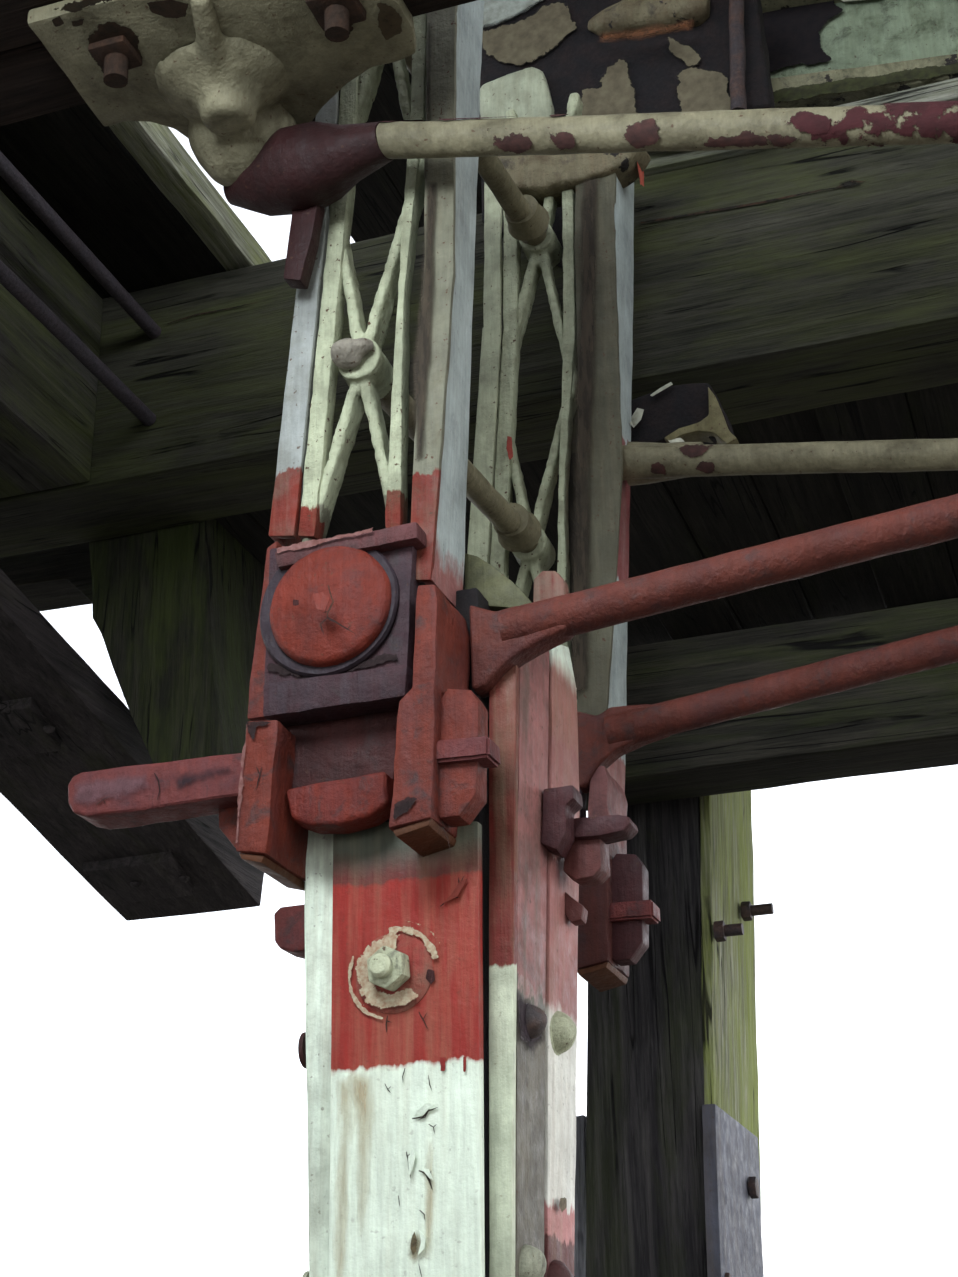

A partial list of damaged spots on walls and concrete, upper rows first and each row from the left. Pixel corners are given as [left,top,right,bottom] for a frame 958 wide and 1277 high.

peeling [52,0,112,27]
peeling [147,0,188,19]
peeling [482,0,577,66]
peeling [763,0,860,73]
peeling [440,117,533,154]
peeling [550,59,660,150]
peeling [668,37,731,112]
peeling [348,921,440,1019]